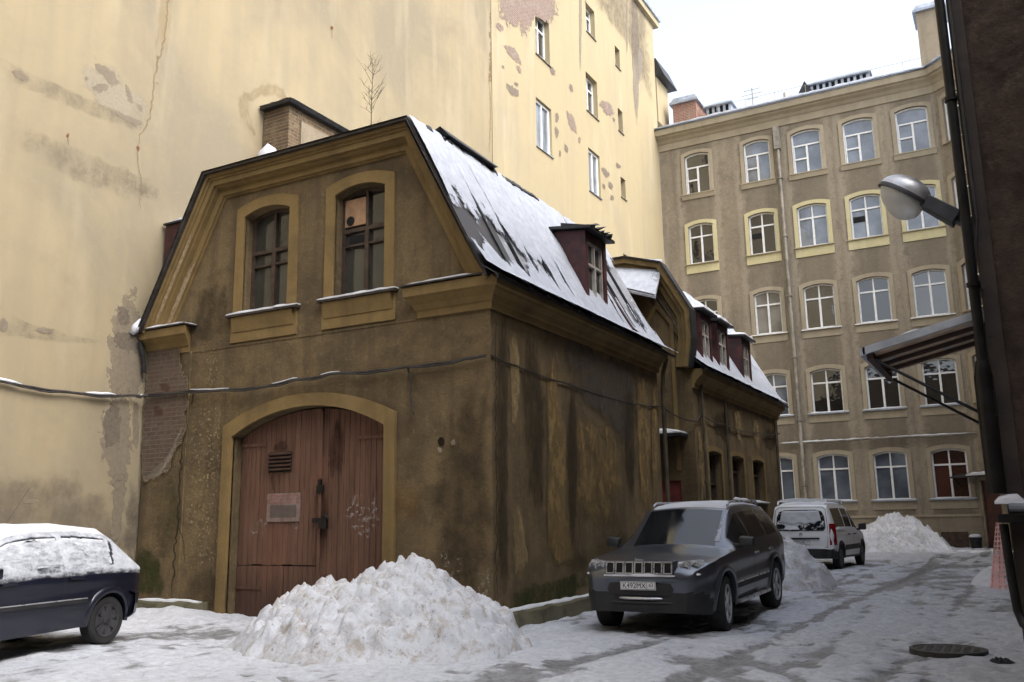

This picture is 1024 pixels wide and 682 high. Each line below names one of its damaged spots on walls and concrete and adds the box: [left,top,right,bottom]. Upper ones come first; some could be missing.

flaking render [496,0,559,38]
peeling [85,64,143,111]
crack [137,0,169,209]
spalling [502,45,522,97]
spalling [555,111,581,157]
spalling [599,100,615,122]
water stain [602,0,644,114]
spalling [601,162,621,200]
spalling [101,287,223,564]
water stain [497,333,657,578]
crack [171,434,186,594]
water stain [514,574,584,607]